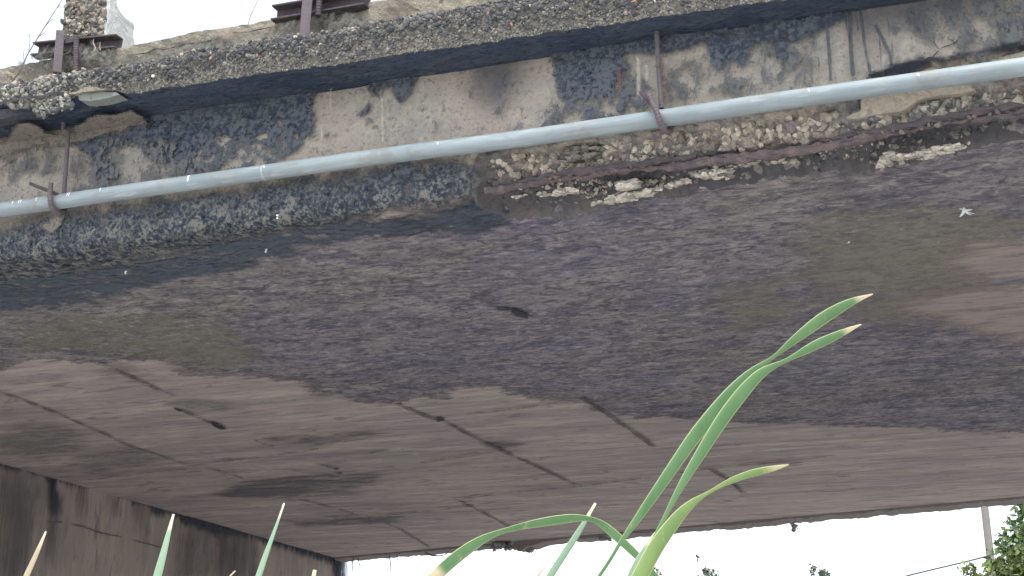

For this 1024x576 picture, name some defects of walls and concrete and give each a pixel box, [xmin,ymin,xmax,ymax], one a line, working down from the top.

spalling [913,41,1024,73]
leakage [0,158,510,311]
peeling [0,77,1024,433]
leakage [803,210,1019,318]
crack [98,362,222,429]
crack [2,394,330,481]
crack [300,405,643,548]
crack [580,398,655,449]
crack [680,455,834,494]